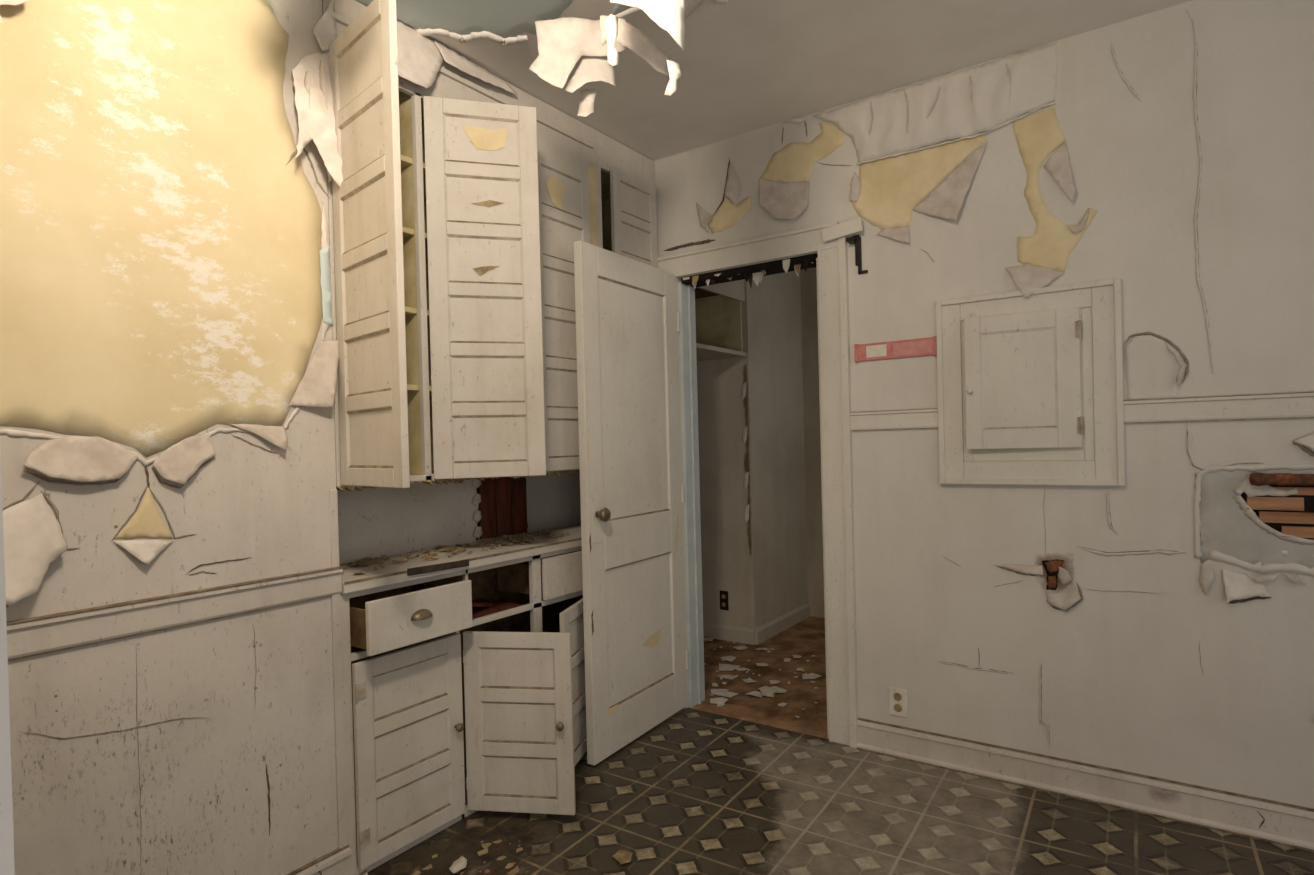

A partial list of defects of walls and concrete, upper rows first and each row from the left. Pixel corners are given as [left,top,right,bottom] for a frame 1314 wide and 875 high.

flaking render [396,0,728,117]
crack [1186,10,1213,374]
peeling [0,0,333,608]
spalling [472,477,528,540]
flaking render [1194,464,1314,576]
spalling [996,559,1083,611]